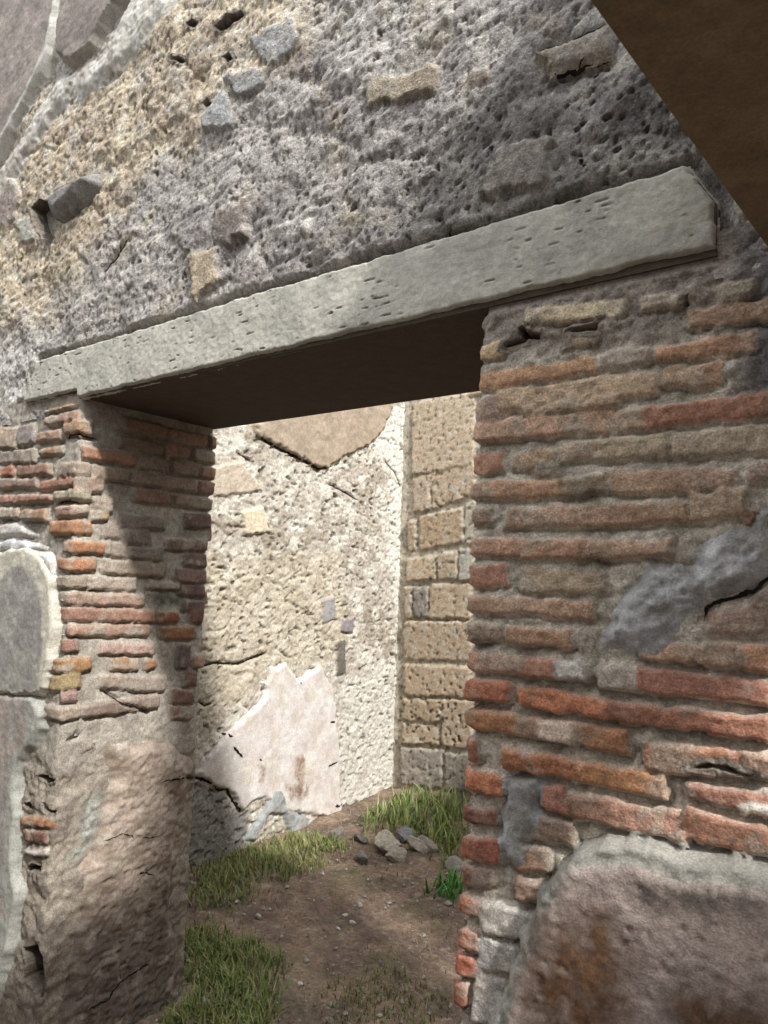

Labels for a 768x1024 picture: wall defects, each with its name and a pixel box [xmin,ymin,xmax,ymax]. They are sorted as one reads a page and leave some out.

crack [542,24,610,79]
crack [704,577,768,621]
crack [204,652,265,666]
crack [162,776,241,812]